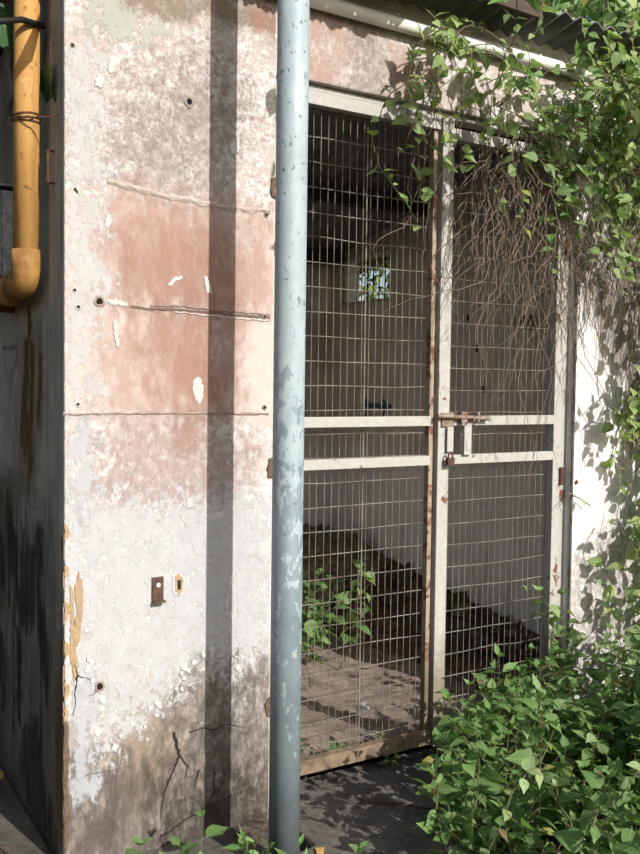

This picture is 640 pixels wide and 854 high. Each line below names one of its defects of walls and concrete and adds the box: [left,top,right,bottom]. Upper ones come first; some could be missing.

rust [20,306,42,478]
peeling [56,0,271,854]
leakage [576,229,640,407]
leakage [0,492,58,854]
crack [87,762,150,802]
leakage [69,662,268,854]
crack [160,724,249,837]